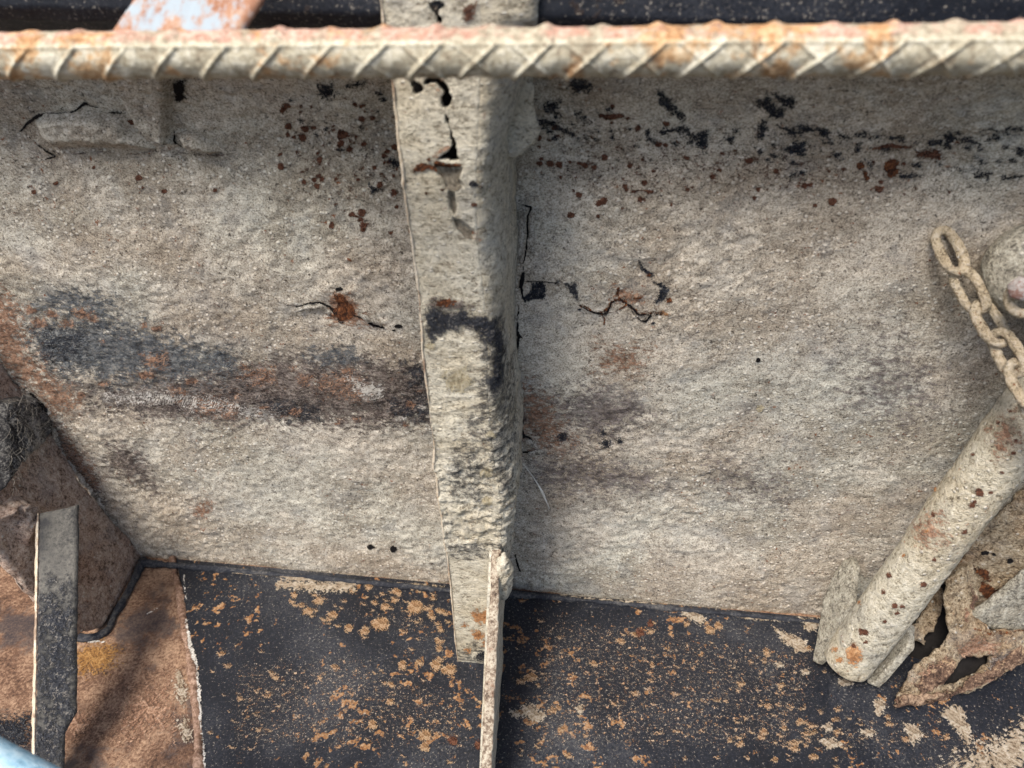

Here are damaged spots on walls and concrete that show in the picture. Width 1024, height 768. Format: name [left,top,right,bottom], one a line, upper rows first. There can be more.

corrosion [264,97,400,232]
spalling [436,166,472,239]
corrosion [536,104,942,219]
leakage [6,282,257,400]
corrosion [0,286,431,509]
crack [285,287,403,331]
crack [522,415,547,456]
crack [516,204,668,350]
corrosion [191,495,216,520]